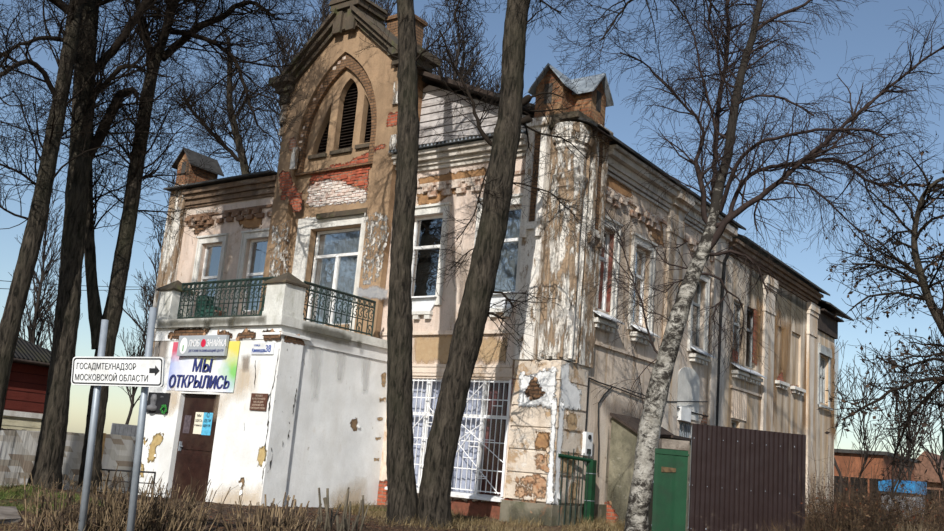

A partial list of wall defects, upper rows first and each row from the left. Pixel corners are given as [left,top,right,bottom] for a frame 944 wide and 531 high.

flaking render [386,111,398,127]
flaking render [236,144,389,285]
damp [749,275,763,359]
damp [773,290,807,420]
peeling [140,433,164,478]
peeling [451,336,582,520]